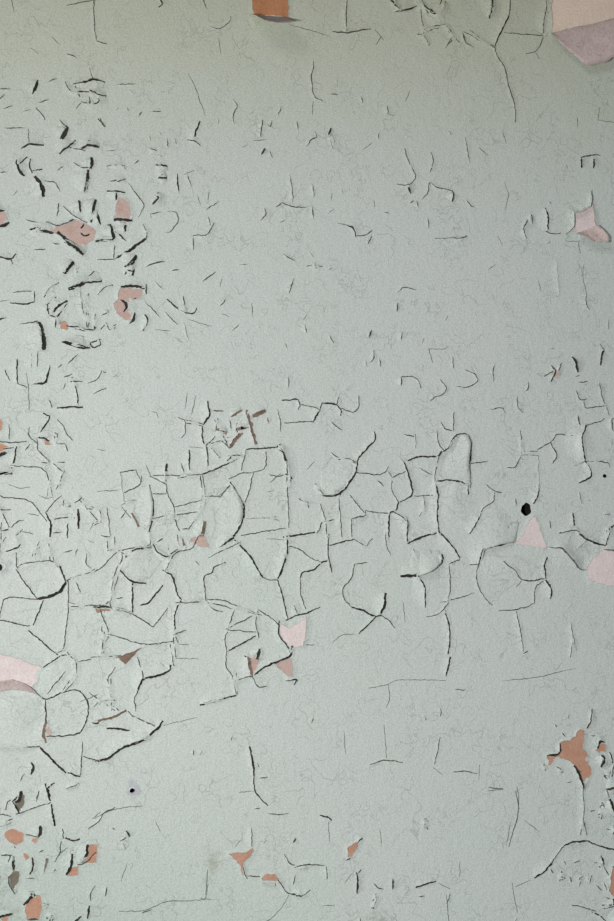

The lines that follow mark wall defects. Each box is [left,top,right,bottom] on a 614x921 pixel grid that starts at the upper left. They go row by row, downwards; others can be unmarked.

peeling [247,0,295,23]
peeling [546,0,614,66]
peeling [46,213,99,249]
crack [0,61,514,876]
crack [507,304,614,507]
peeling [242,616,314,680]
crack [498,510,614,657]
peeling [0,786,53,921]
crack [70,885,111,921]
crack [227,736,453,921]
crack [512,708,614,921]
peeling [542,724,611,789]